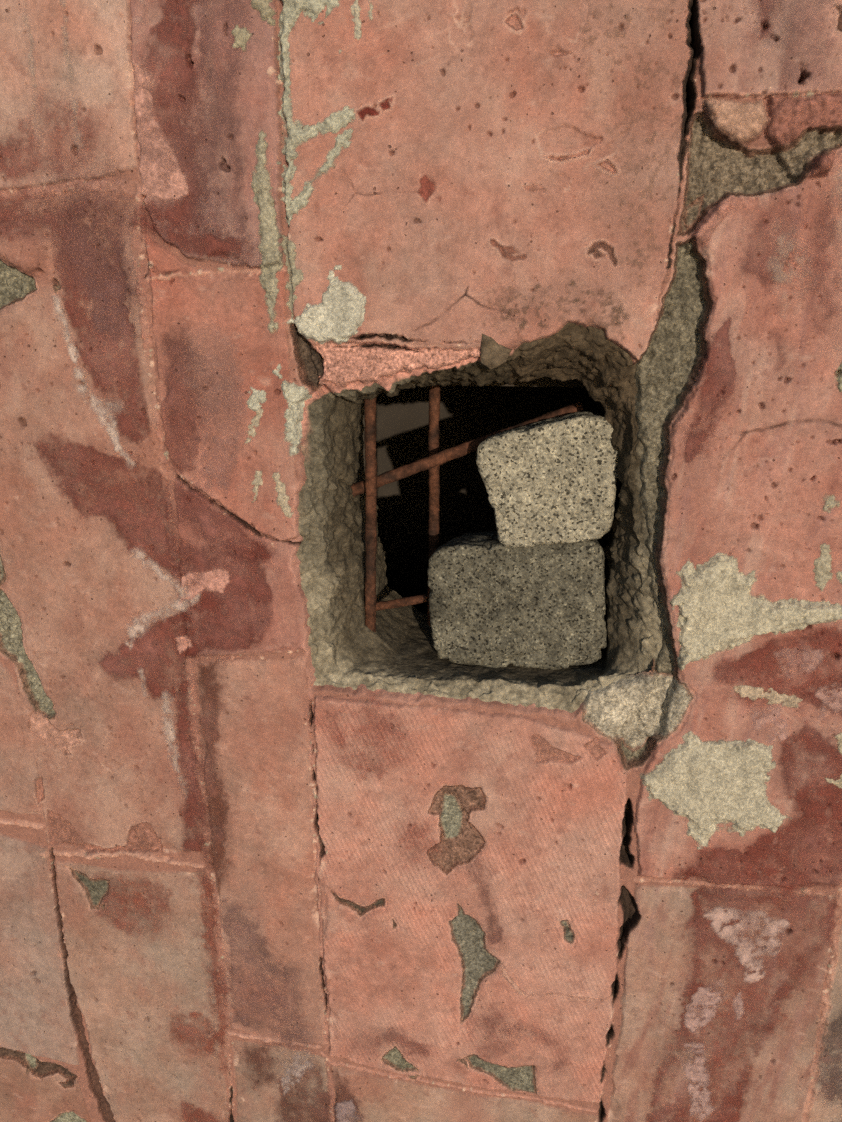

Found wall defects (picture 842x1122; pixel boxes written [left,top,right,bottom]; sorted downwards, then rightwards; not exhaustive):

crack [678,0,702,193]
spalling [0,259,37,309]
crack [667,223,676,269]
crack [178,475,301,544]
spalling [252,111,842,769]
spalling [0,557,81,754]
water stain [0,200,304,1052]
crack [52,849,115,1122]
spalling [427,785,486,874]
spalling [449,905,500,1023]
crack [599,798,641,1122]
water stain [647,627,842,1122]